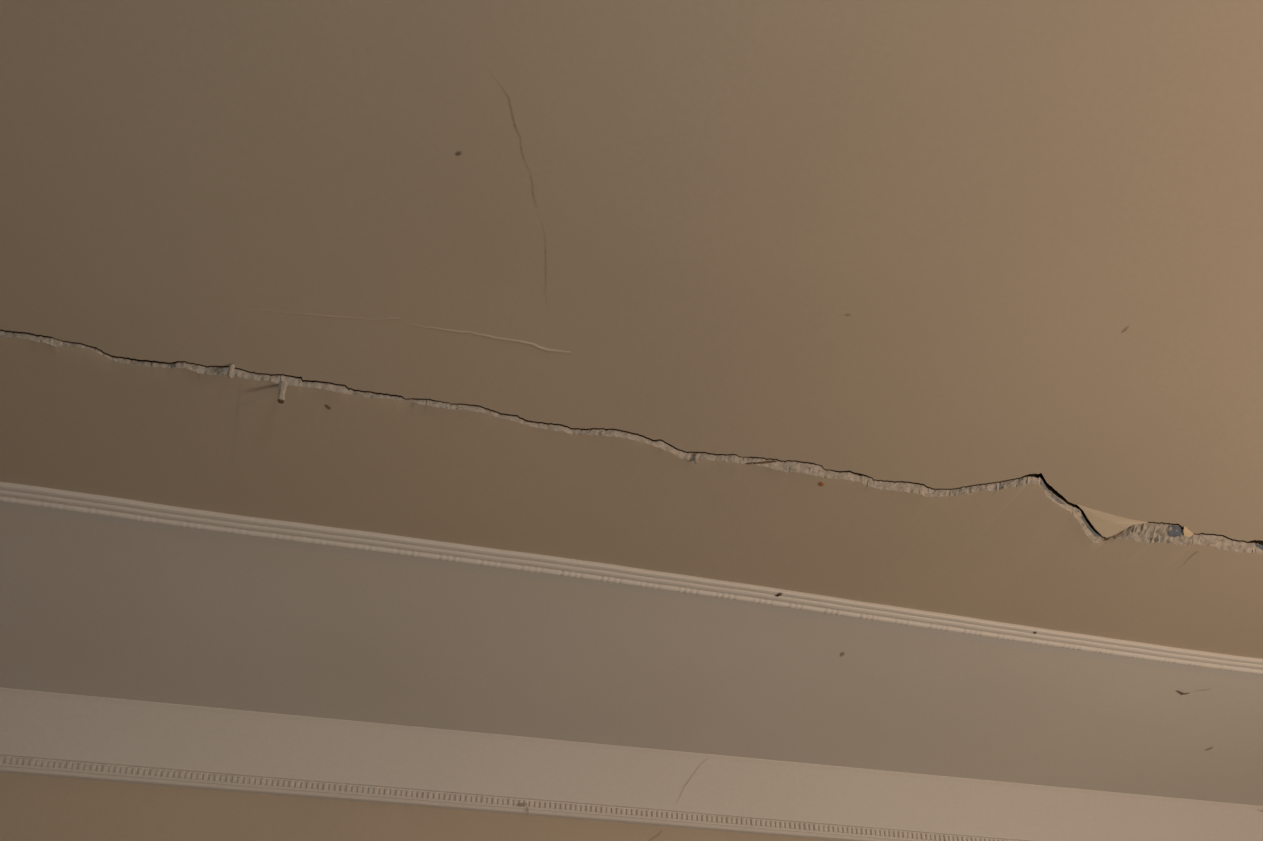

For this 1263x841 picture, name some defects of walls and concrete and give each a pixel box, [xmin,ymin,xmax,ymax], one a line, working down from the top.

crack [0,329,1263,555]
peeling [1077,504,1148,538]